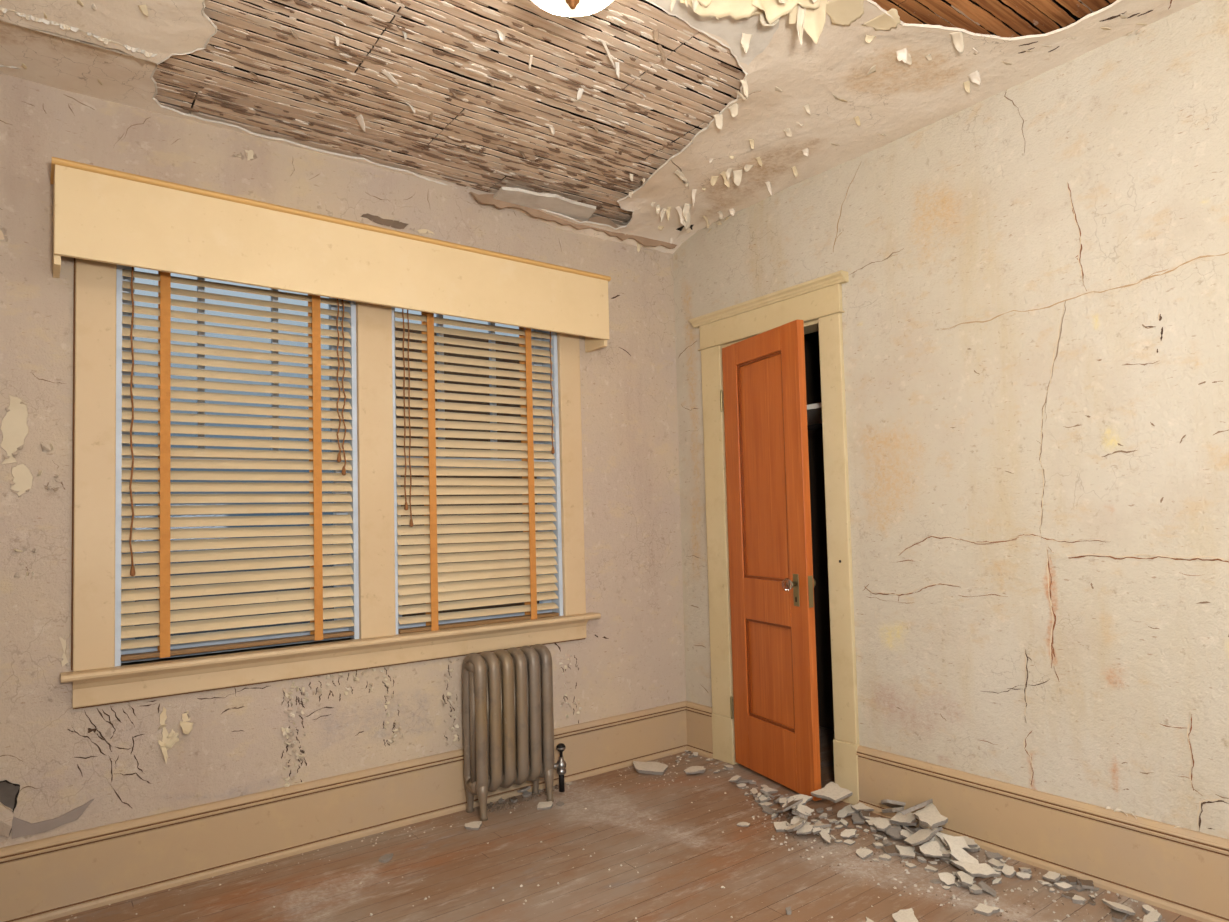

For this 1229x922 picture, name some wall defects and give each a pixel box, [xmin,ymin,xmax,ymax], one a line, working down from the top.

flaking render [150,0,1147,252]
crack [833,161,862,250]
peeling [0,393,34,497]
crack [864,183,1229,789]
crack [68,700,160,808]
peeling [158,706,193,763]
crack [1121,716,1229,830]